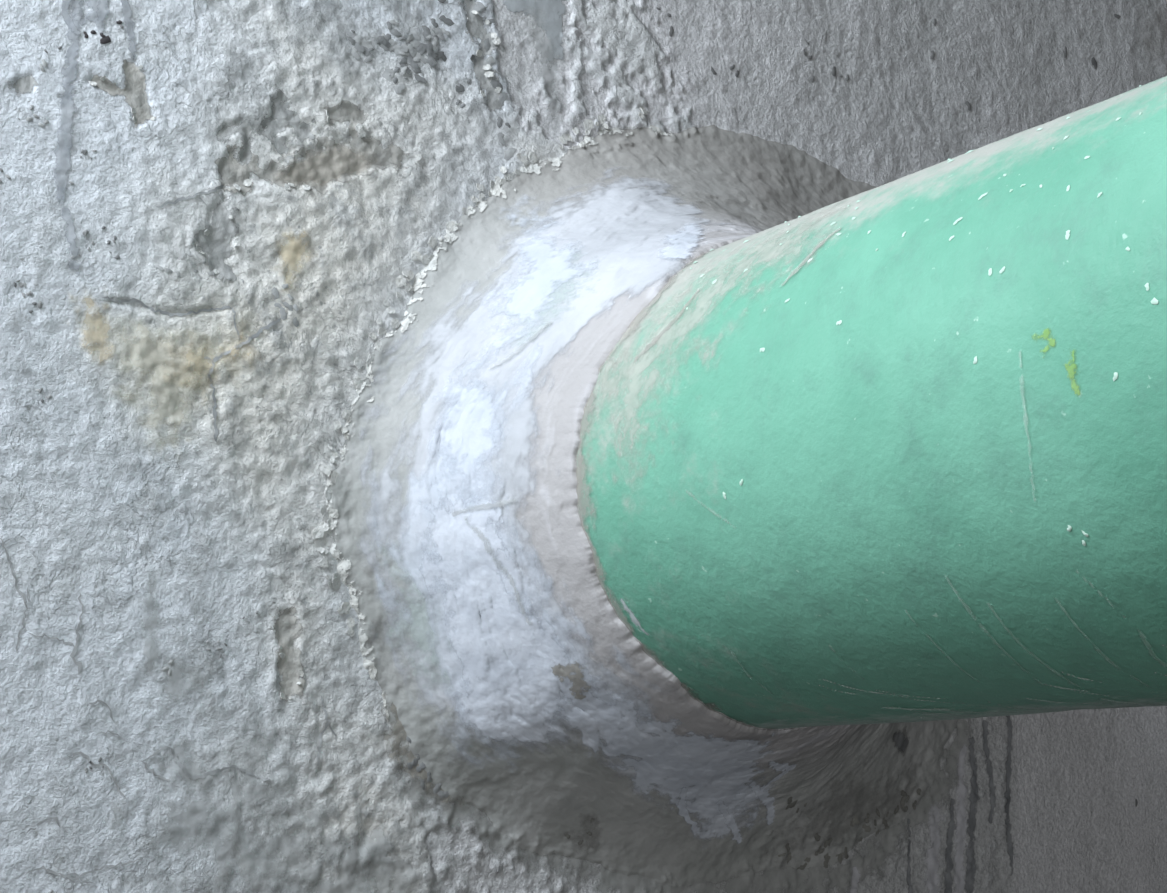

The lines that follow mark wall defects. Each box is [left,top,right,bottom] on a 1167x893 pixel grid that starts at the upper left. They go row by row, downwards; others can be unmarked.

water stain [44,0,137,274]
peeling [154,85,422,283]
peeling [311,0,725,737]
water stain [778,788,921,893]
water stain [926,715,1013,893]